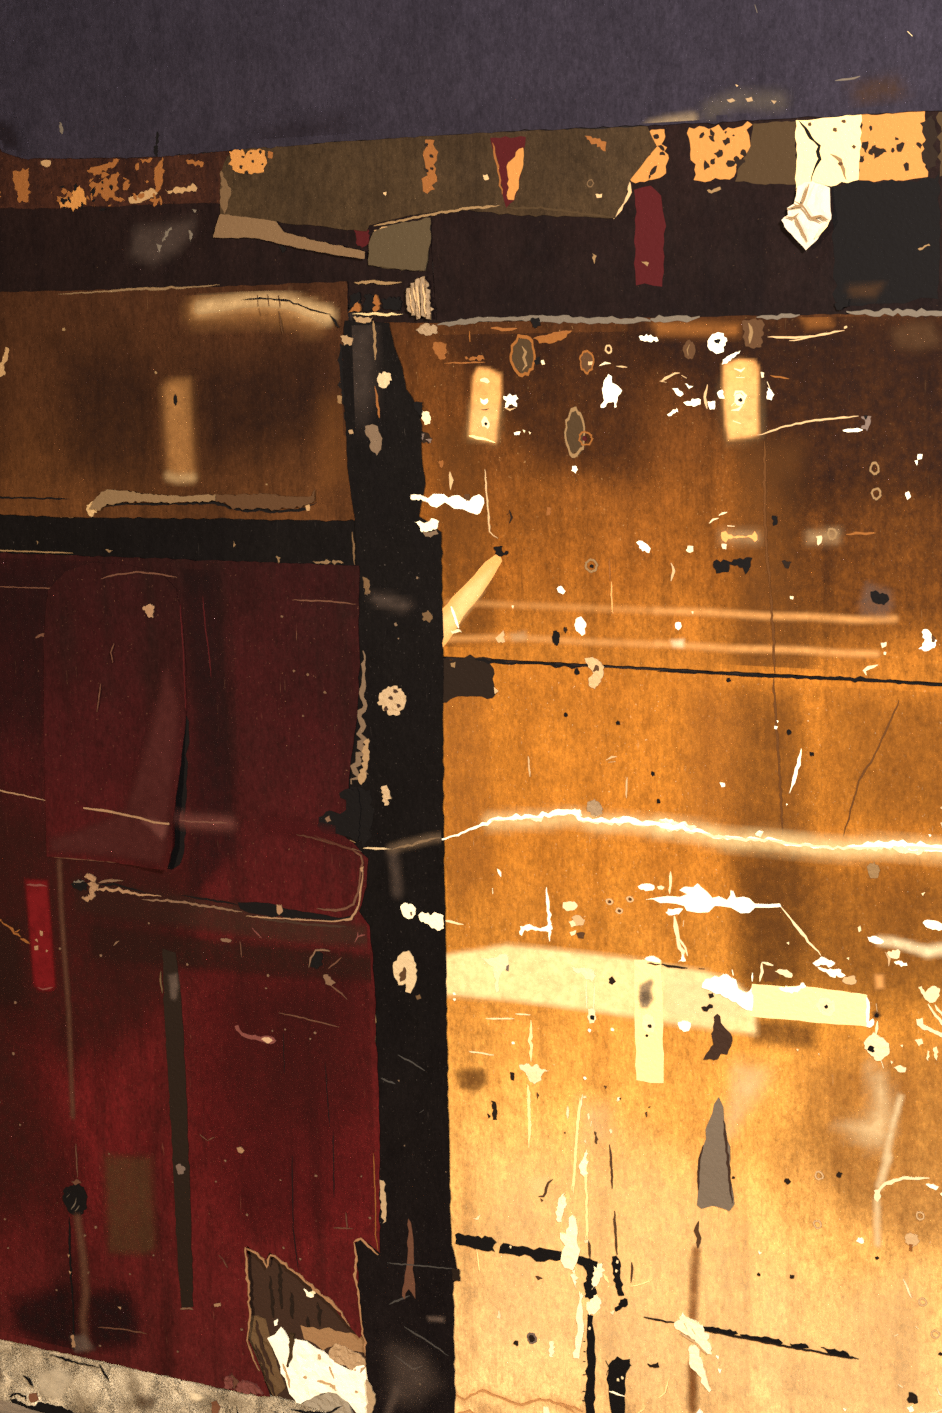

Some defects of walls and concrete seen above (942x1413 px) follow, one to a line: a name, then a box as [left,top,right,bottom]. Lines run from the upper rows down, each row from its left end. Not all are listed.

rust [0,149,232,211]
peeling [631,129,669,183]
peeling [687,121,832,250]
crack [296,441,942,854]
crack [0,790,45,801]
flaking render [638,883,781,915]